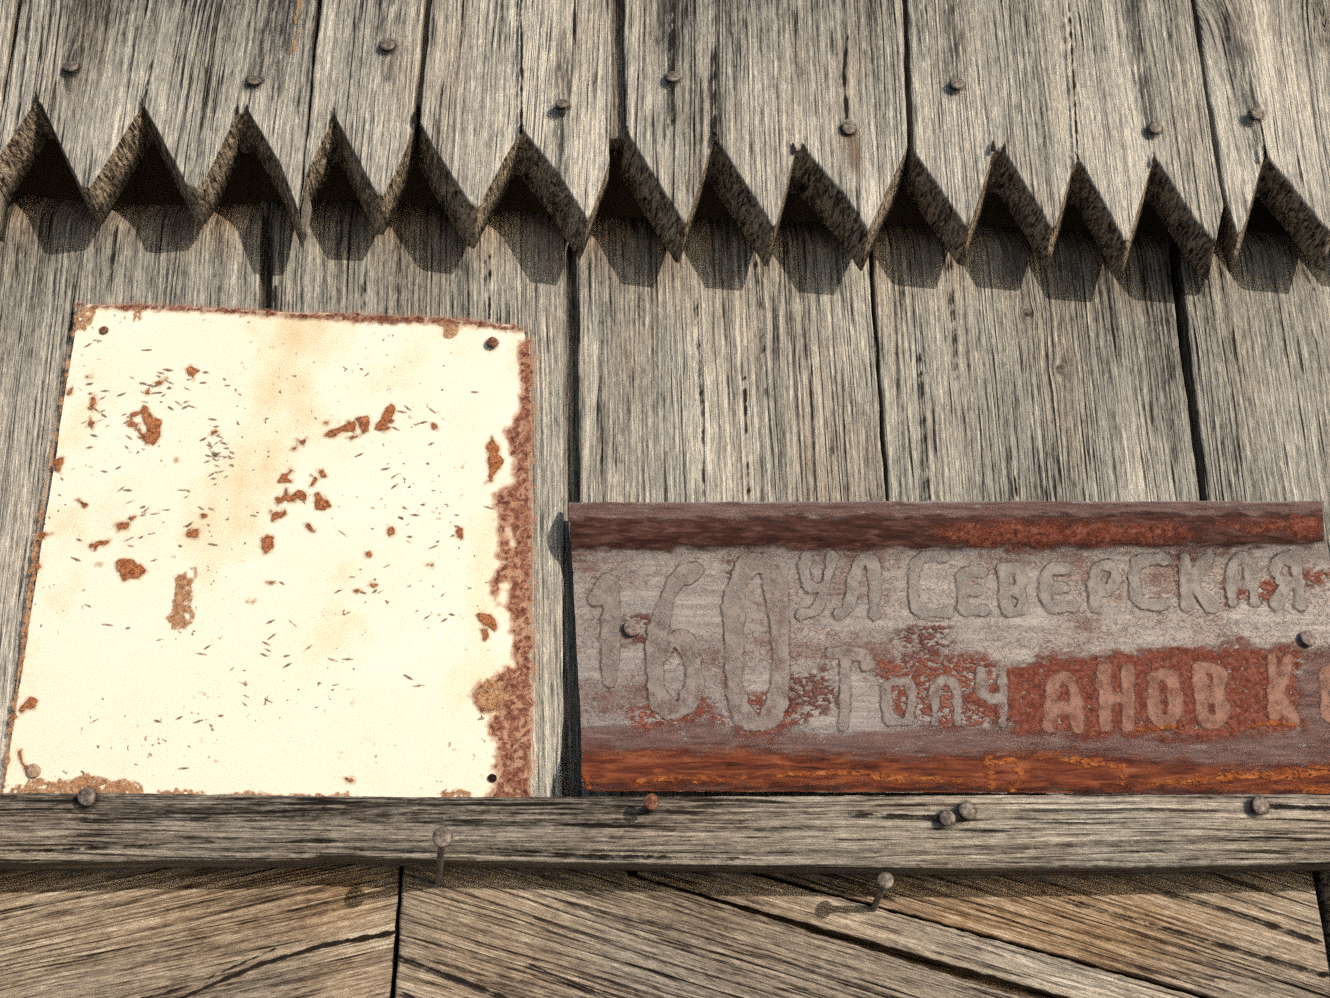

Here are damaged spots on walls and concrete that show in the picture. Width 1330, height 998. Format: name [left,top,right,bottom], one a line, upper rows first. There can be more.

corrosion [0,396,205,795]
corrosion [64,303,538,797]
corrosion [569,501,1325,599]
corrosion [1221,570,1330,607]
corrosion [581,614,1330,795]